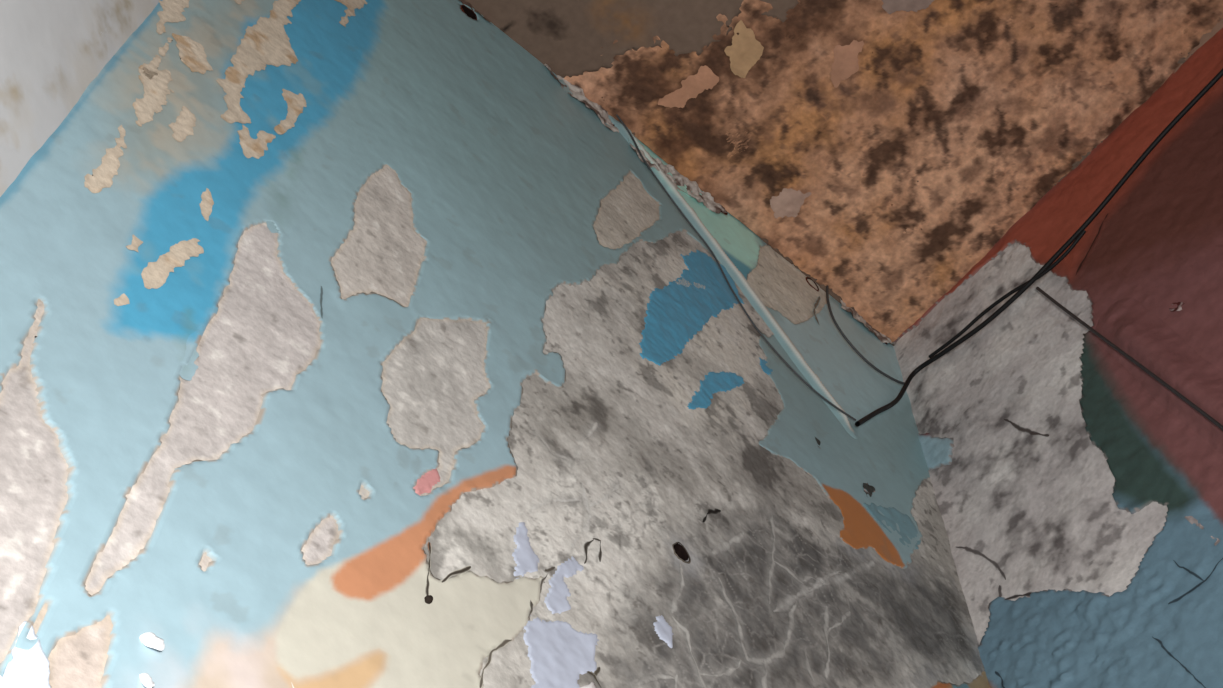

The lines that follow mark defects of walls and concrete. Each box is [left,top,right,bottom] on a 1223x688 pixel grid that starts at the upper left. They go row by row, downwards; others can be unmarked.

peeling [84,0,307,193]
peeling [335,0,367,27]
peeling [199,188,214,221]
peeling [331,164,427,307]
peeling [0,299,113,688]
peeling [85,223,321,596]
peeling [301,515,339,565]
peeling [381,317,491,496]
spalling [424,0,1223,688]
peeling [140,632,165,651]